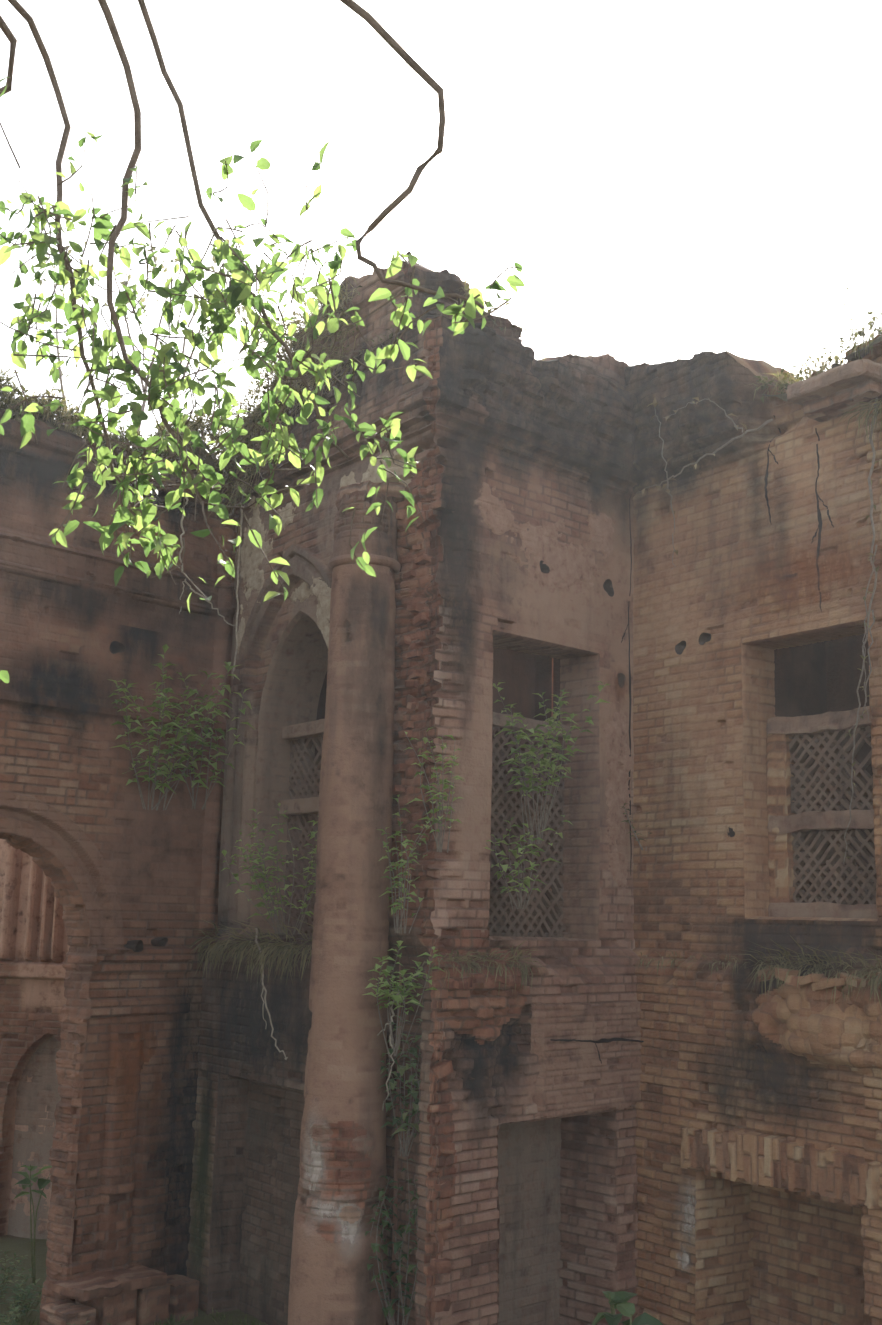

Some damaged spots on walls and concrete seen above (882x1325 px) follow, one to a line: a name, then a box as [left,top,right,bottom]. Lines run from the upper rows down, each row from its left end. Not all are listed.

leakage [10,659,103,729]
spalling [339,251,546,1325]
crack [550,1038,644,1064]
spalling [305,1119,375,1243]